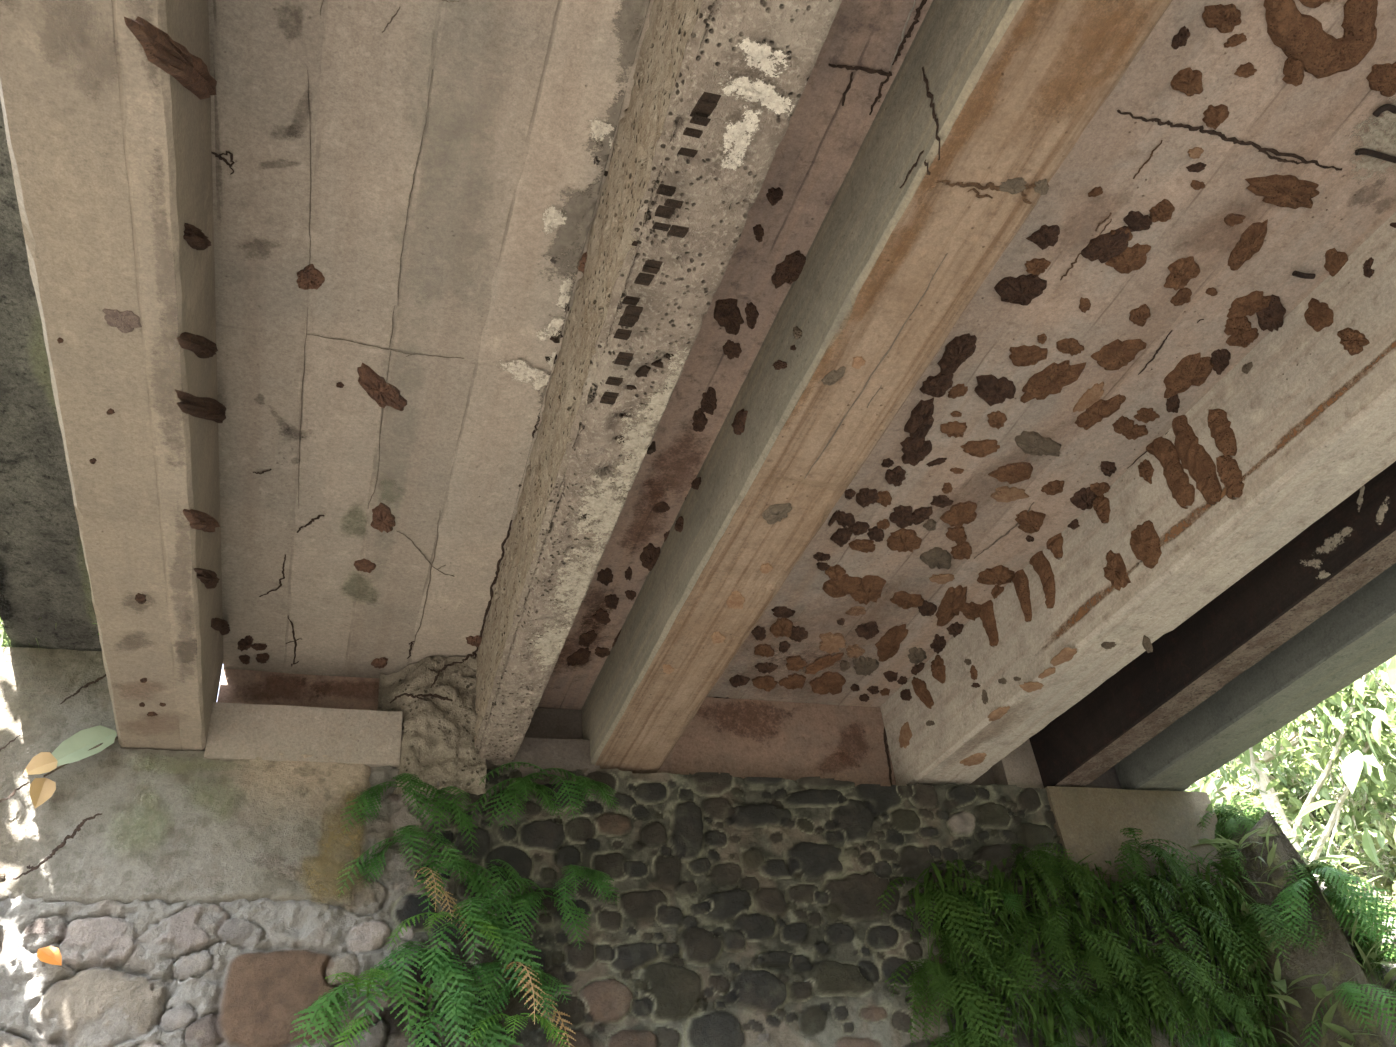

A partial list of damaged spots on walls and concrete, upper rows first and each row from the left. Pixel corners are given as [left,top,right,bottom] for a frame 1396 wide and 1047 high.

crack [829,0,1049,204]
spalling [1170,67,1229,130]
spalling [1202,3,1247,48]
crack [1117,109,1342,179]
spalling [1263,0,1396,183]
crack [253,69,464,667]
peeling [496,0,650,520]
spalling [1304,298,1370,356]
damp [0,569,13,629]
crack [389,514,512,704]
spalling [729,290,1286,748]
crack [12,813,102,880]